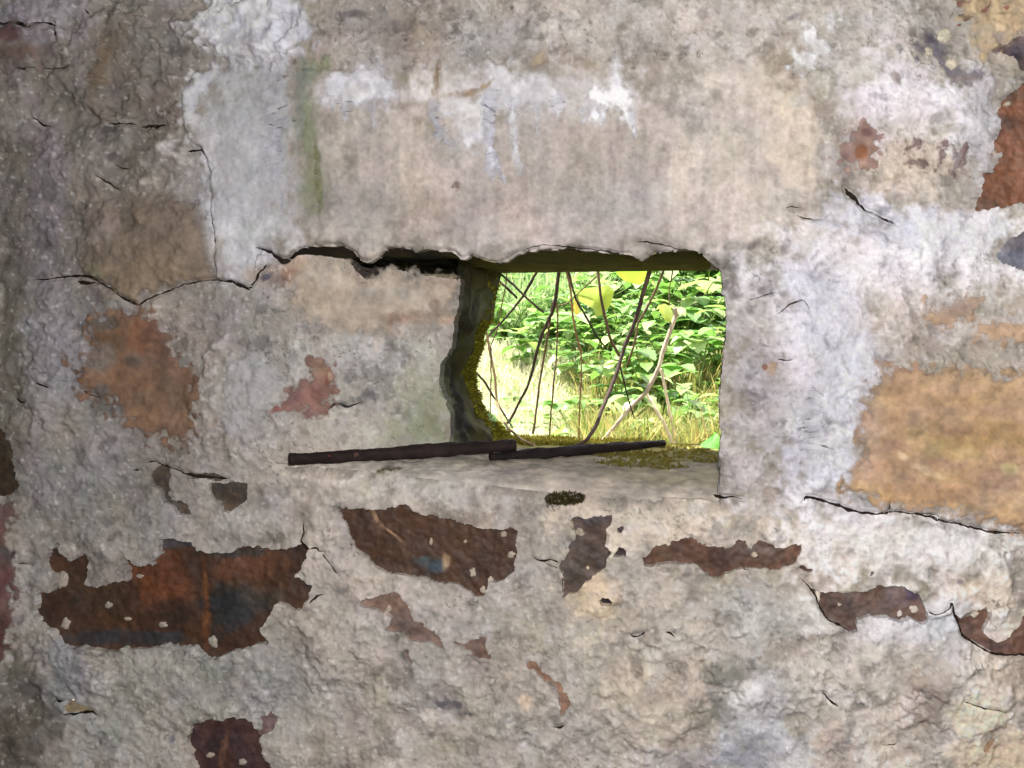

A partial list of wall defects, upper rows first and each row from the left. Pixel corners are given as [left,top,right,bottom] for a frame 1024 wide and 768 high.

water stain [321,56,395,127]
water stain [429,58,564,182]
water stain [579,58,637,136]
crack [94,165,129,190]
crack [844,188,895,225]
crack [35,247,291,306]
spalling [339,504,518,596]
spalling [559,510,626,598]
spalling [642,537,812,577]
crack [804,496,1021,534]
spalling [38,539,312,657]
spalling [812,571,927,631]